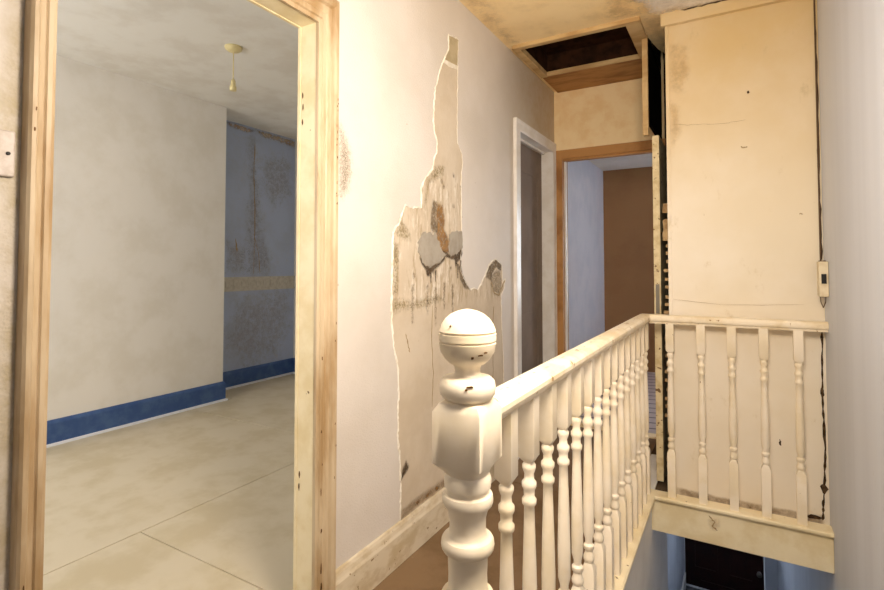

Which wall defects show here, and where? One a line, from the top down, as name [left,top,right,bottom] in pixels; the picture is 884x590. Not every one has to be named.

crack [814,33,822,175]
flaking render [392,59,505,519]
crack [817,203,825,257]
crack [807,332,829,520]